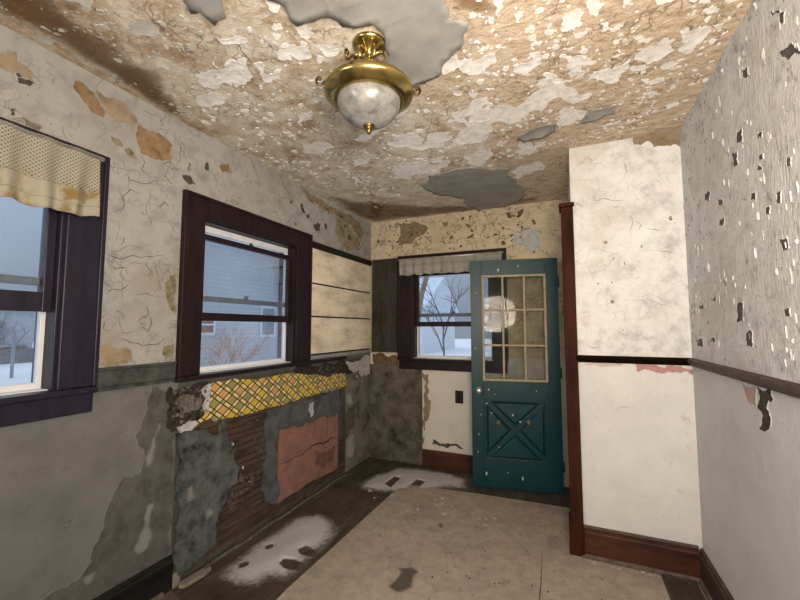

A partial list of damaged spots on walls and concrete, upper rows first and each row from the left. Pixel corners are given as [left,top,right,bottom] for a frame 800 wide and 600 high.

flaking render [0,49,43,131]
damp [0,0,165,101]
flaking render [72,80,173,162]
peeling [126,0,800,256]
peeling [688,231,756,350]
peeling [746,222,800,280]
flaking render [99,343,134,367]
flaking render [293,359,353,376]
peeling [584,362,693,375]
flaking render [743,382,775,433]
peeling [771,307,800,370]
flaking render [42,381,346,600]